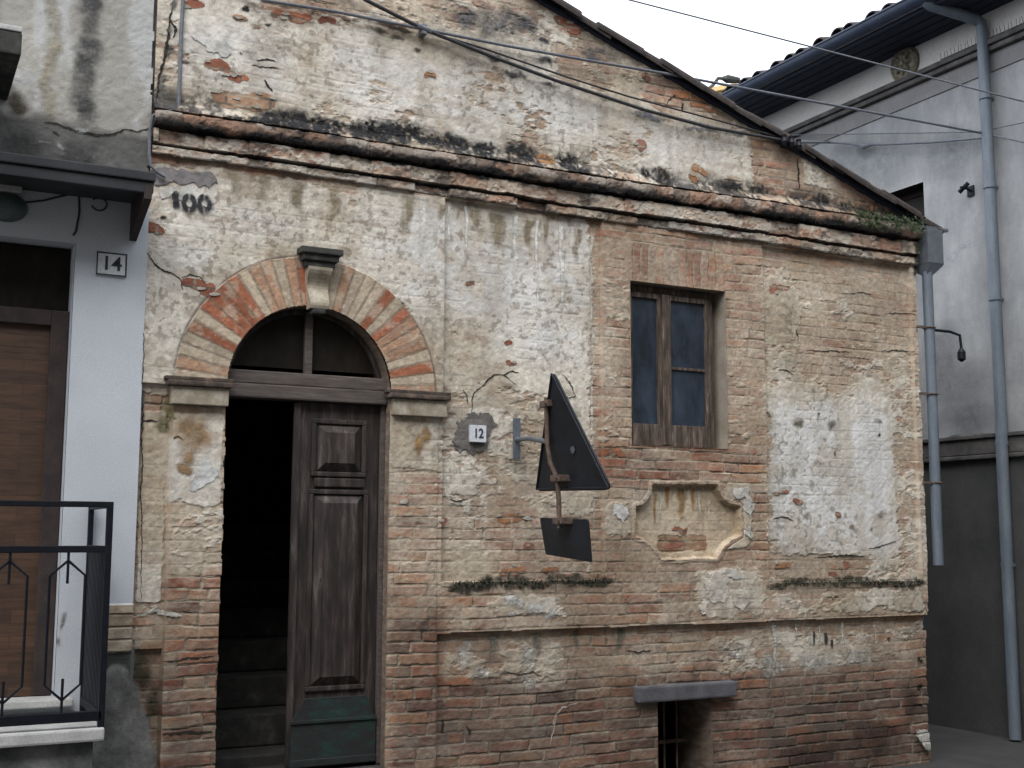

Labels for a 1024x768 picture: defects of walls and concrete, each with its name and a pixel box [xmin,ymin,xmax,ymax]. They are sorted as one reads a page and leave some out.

water stain [74,0,102,117]
peeling [674,88,722,116]
crack [44,122,149,137]
water stain [185,123,225,140]
peeling [633,139,647,151]
water stain [229,111,902,244]
peeling [688,163,707,183]
crack [147,253,205,289]
water stain [464,206,595,450]
crack [463,371,519,412]
peeling [772,490,809,516]